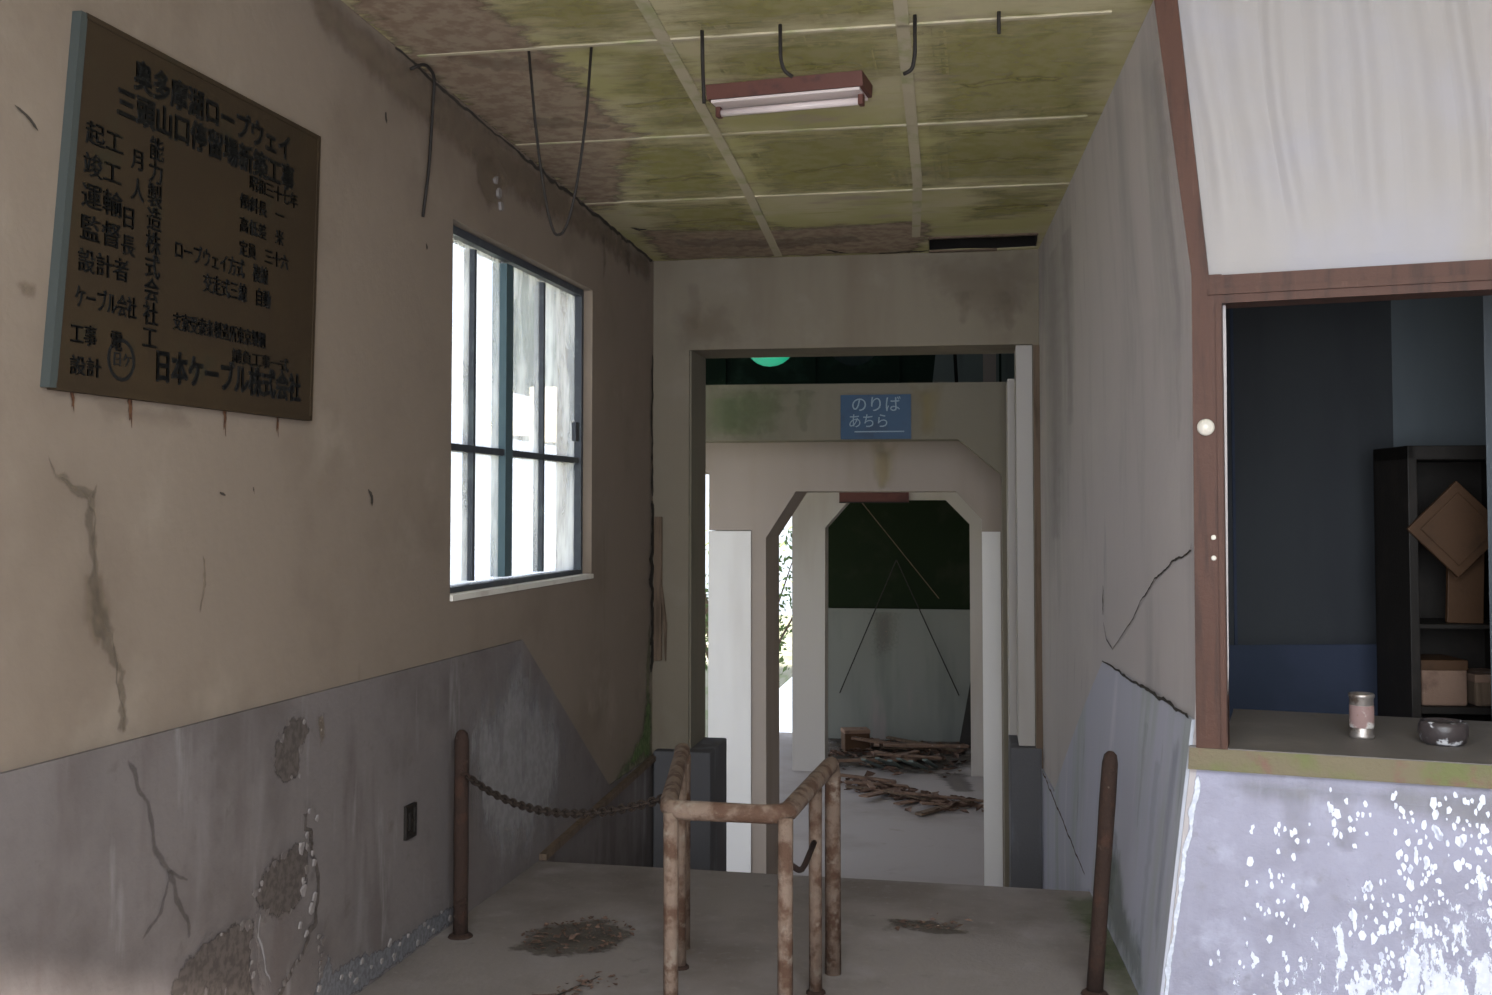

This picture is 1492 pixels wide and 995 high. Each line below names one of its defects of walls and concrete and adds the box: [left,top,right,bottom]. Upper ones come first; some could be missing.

leakage [351,0,708,210]
leakage [642,219,931,261]
crack [89,579,106,638]
crack [1102,550,1191,718]
spalling [272,713,324,783]
spalling [171,808,320,995]
leakage [1164,776,1200,995]